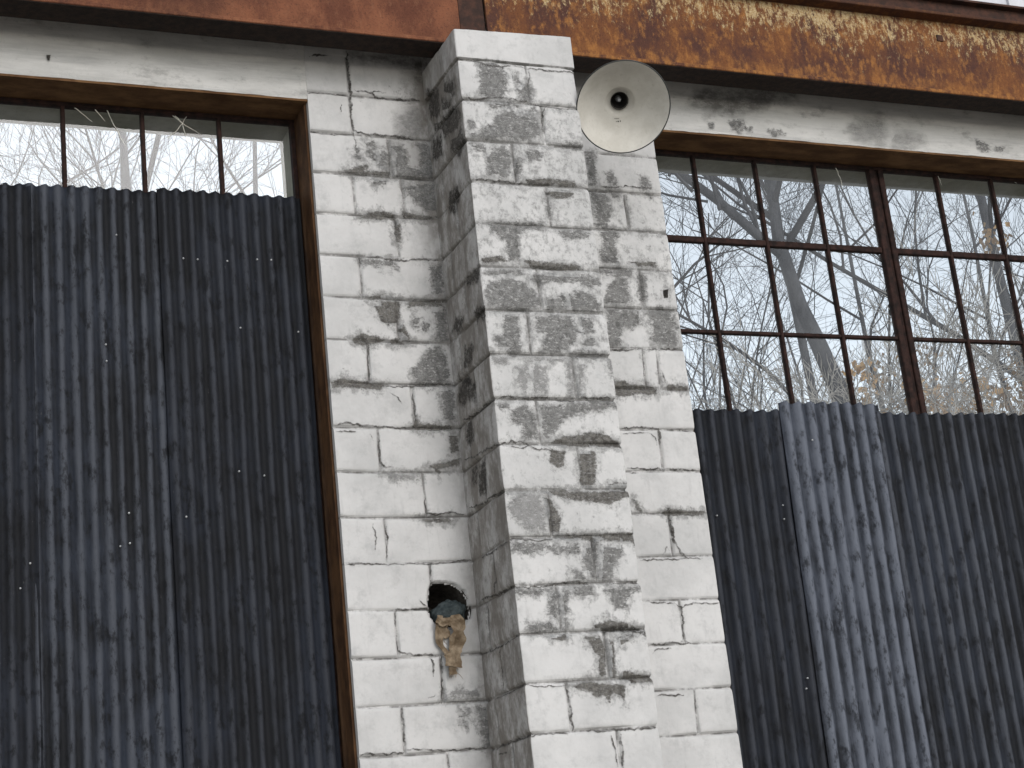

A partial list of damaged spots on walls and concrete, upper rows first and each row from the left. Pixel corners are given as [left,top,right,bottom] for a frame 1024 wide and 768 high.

crack [308,53,419,150]
peeling [348,61,688,703]
spalling [662,508,704,517]
crack [349,526,656,766]
crack [613,518,719,651]